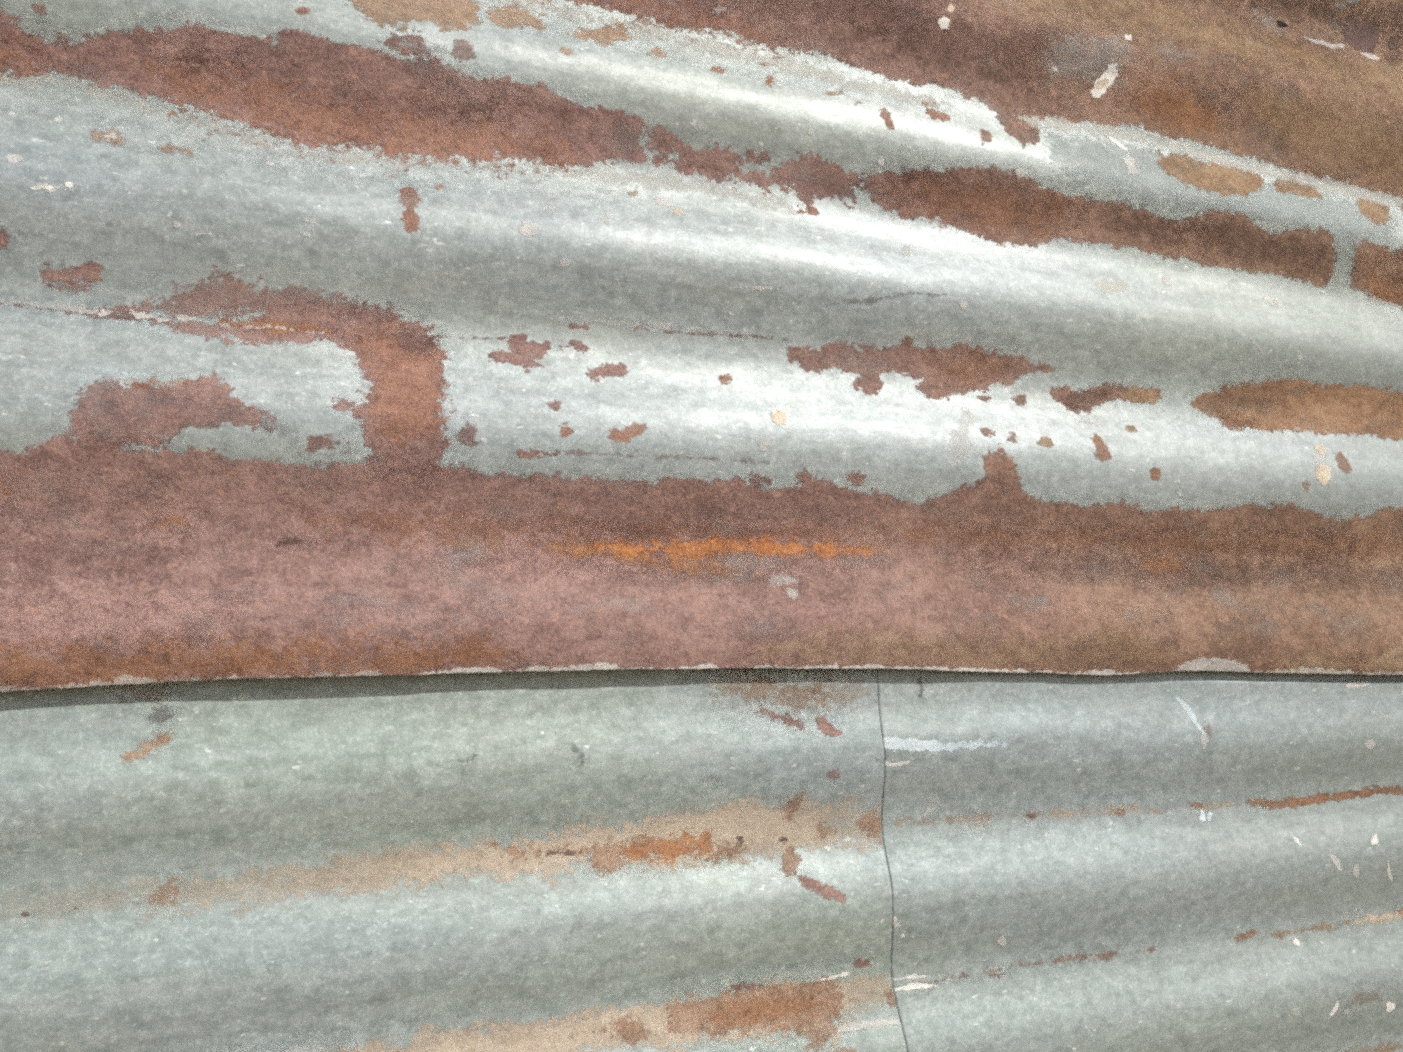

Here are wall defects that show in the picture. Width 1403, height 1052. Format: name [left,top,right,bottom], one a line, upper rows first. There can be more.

rust [0,0,1403,311]
peeling [1049,131,1399,261]
rust [0,261,1403,692]
peeling [1314,443,1331,485]